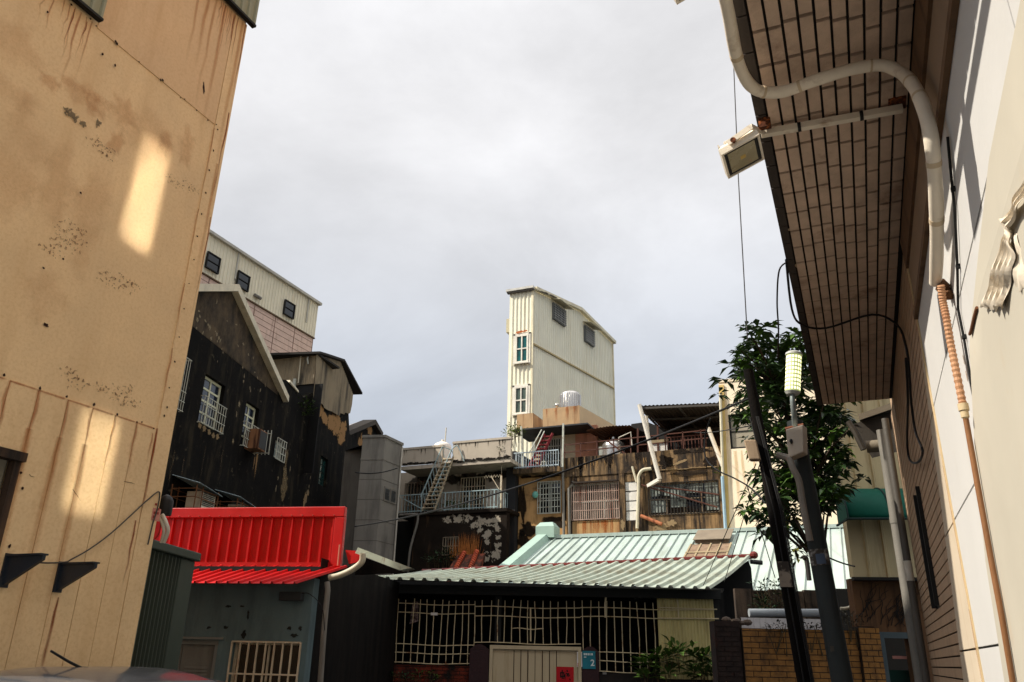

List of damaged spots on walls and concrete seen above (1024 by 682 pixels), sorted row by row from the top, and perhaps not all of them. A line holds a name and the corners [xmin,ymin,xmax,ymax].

peeling [63,107,115,161]
peeling [59,366,141,407]
flaking render [320,406,347,445]
peeling [443,486,506,562]